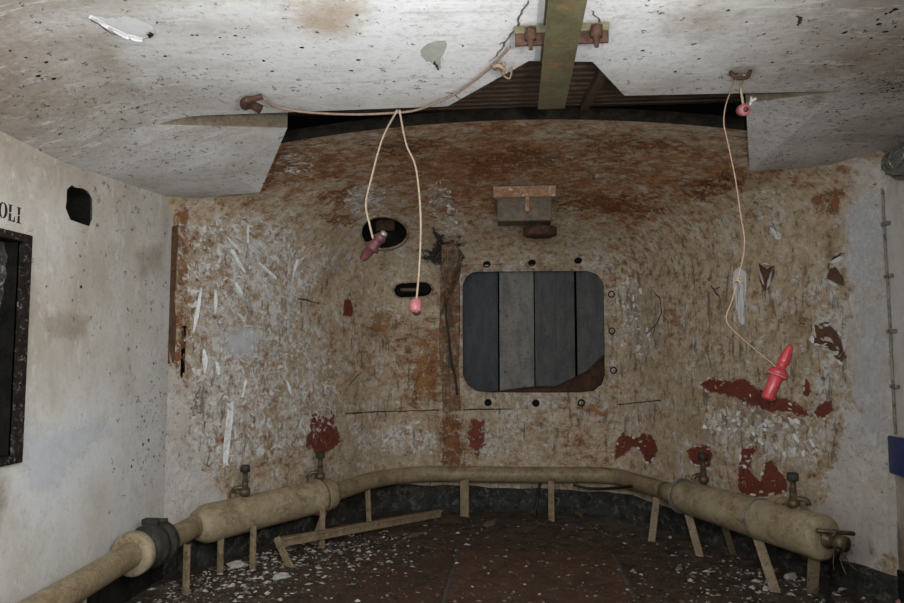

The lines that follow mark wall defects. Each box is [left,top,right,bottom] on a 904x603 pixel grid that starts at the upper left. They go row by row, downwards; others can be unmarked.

peeling [89,13,155,42]
rust [262,153,281,191]
rust [360,134,442,160]
rust [456,144,561,182]
rust [559,130,694,164]
rust [555,166,743,220]
flaking render [825,253,845,309]
peeling [168,215,343,470]
peeling [809,321,847,365]
peeling [466,418,488,460]
peeling [612,428,658,466]
peeling [686,375,833,497]